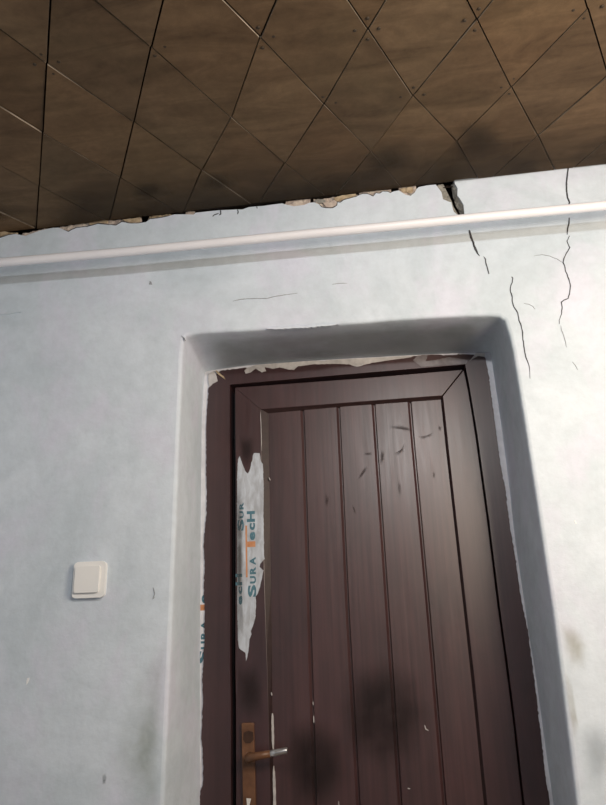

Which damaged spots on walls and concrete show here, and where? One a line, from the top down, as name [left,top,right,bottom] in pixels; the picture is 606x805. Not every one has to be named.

spalling [0,214,171,238]
crack [437,184,489,274]
crack [535,168,578,370]
crack [510,277,535,371]